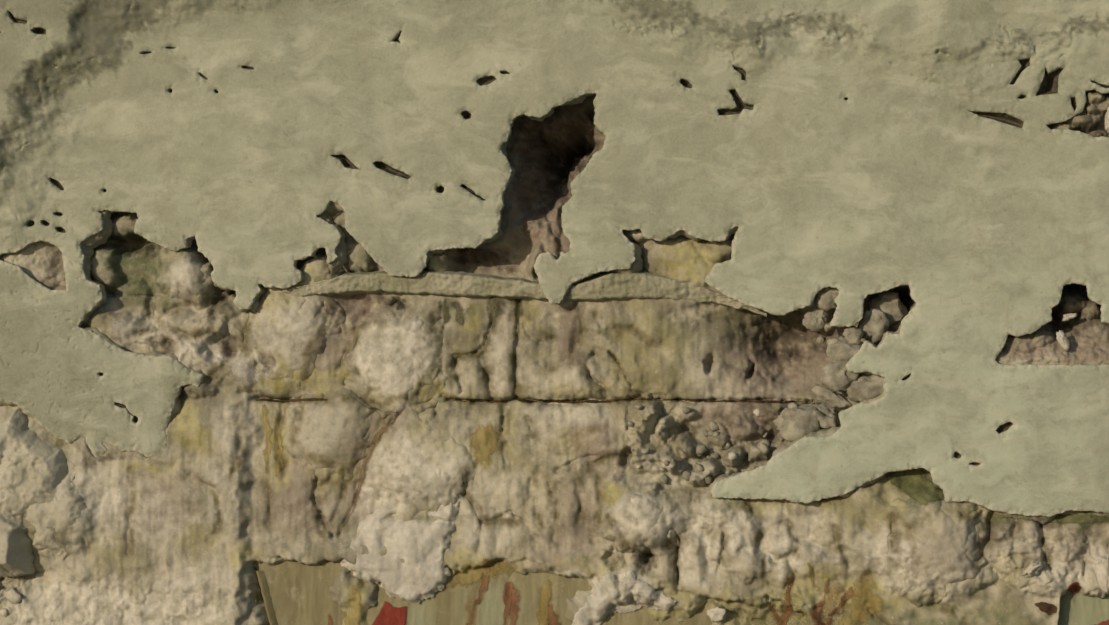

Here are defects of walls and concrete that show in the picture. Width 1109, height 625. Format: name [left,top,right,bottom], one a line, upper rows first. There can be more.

water stain [0,0,167,166]
spalling [1048,90,1109,137]
water stain [442,299,464,329]
spalling [0,94,916,625]
crack [445,396,815,404]
spalling [996,283,1109,365]
crack [256,396,382,535]
water stain [340,492,516,625]
rust [467,560,490,625]
rust [503,582,519,625]
water stain [572,569,677,625]
spalling [605,471,1109,625]